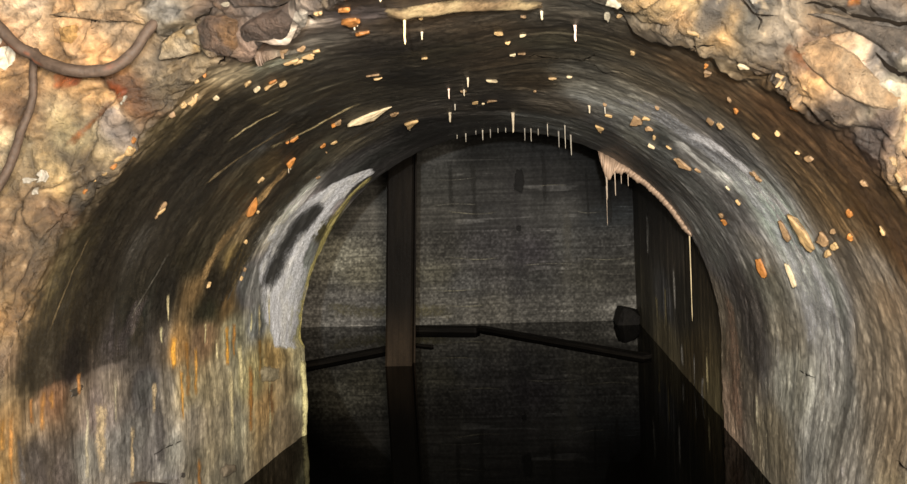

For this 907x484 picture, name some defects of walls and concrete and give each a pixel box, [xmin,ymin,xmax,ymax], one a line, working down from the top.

water stain [598,151,692,237]
water stain [119,260,165,346]
rust [0,420,13,482]
water stain [85,387,117,472]
water stain [152,384,164,458]
rust [171,341,198,416]
water stain [230,348,243,423]
rust [249,343,261,431]